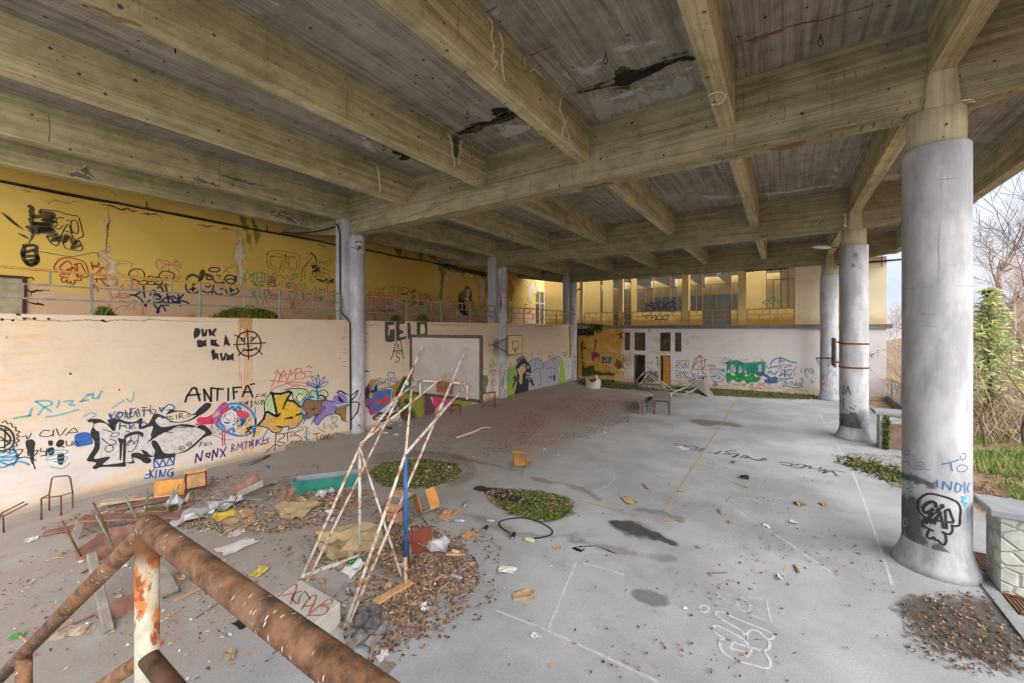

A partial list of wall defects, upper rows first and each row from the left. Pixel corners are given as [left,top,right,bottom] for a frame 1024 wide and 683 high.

rust [238,318,252,455]